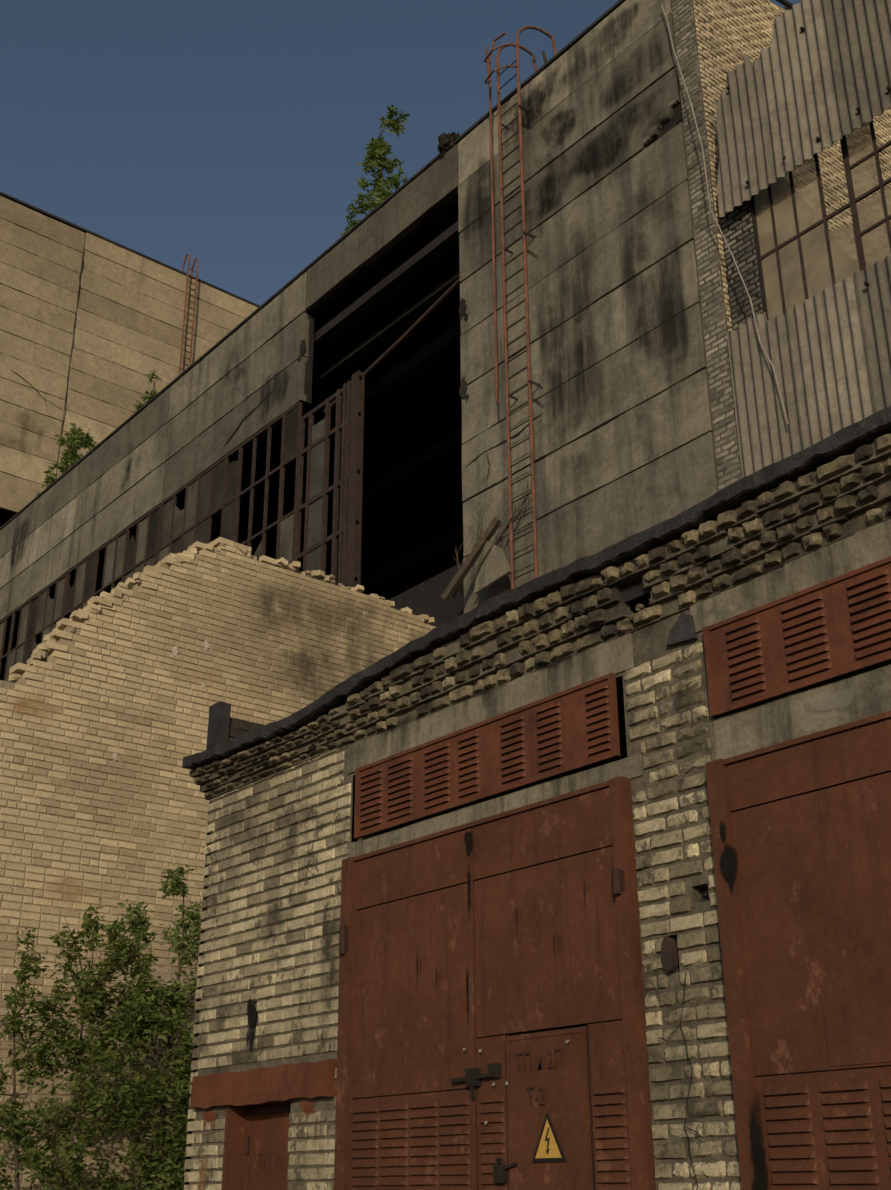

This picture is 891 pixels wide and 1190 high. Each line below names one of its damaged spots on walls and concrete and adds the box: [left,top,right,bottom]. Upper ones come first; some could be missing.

water stain [516,73,556,127]
water stain [659,245,687,348]
crack [13,251,85,432]
water stain [553,335,595,406]
water stain [246,1028,254,1054]
water stain [749,1101,768,1190]